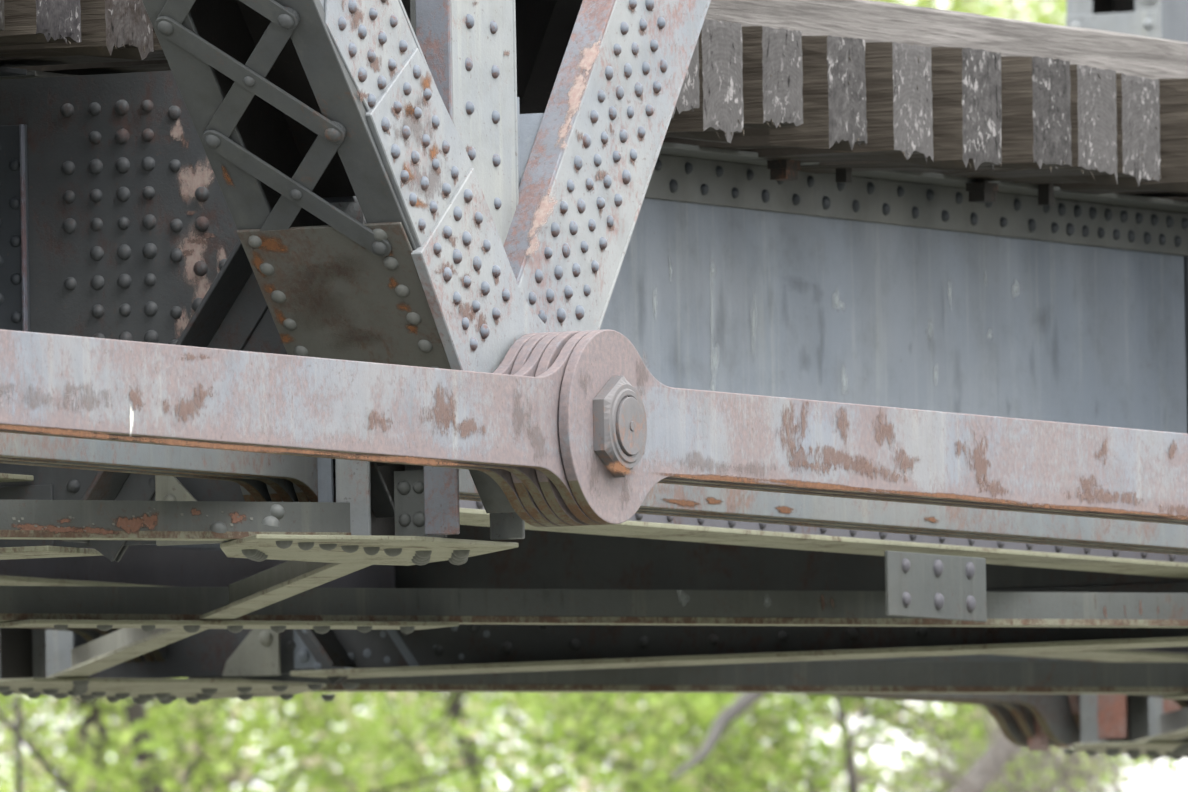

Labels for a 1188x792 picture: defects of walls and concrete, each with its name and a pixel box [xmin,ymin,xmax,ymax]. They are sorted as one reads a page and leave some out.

corrosion [129,389,143,411]
corrosion [163,384,213,421]
corrosion [369,411,393,432]
corrosion [421,385,485,439]
corrosion [663,402,1188,520]
peeling [12,508,159,535]